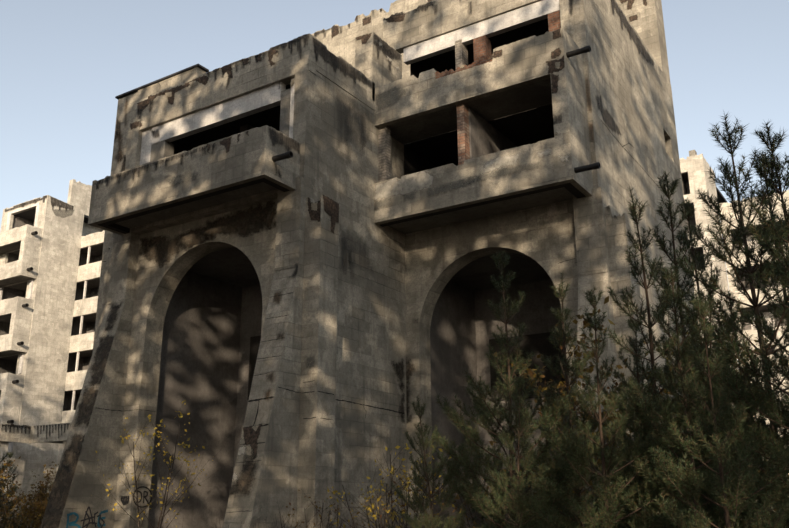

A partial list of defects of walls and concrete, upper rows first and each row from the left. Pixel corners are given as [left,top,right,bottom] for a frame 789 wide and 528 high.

spalling [130,75,209,130]
spalling [221,65,233,88]
water stain [255,8,406,110]
spalling [355,16,372,44]
spalling [386,13,405,22]
spalling [546,29,565,93]
water stain [597,96,620,134]
water stain [611,0,654,66]
spalling [620,0,647,22]
water stain [2,303,121,528]
crack [237,338,405,463]
water stain [391,359,414,423]